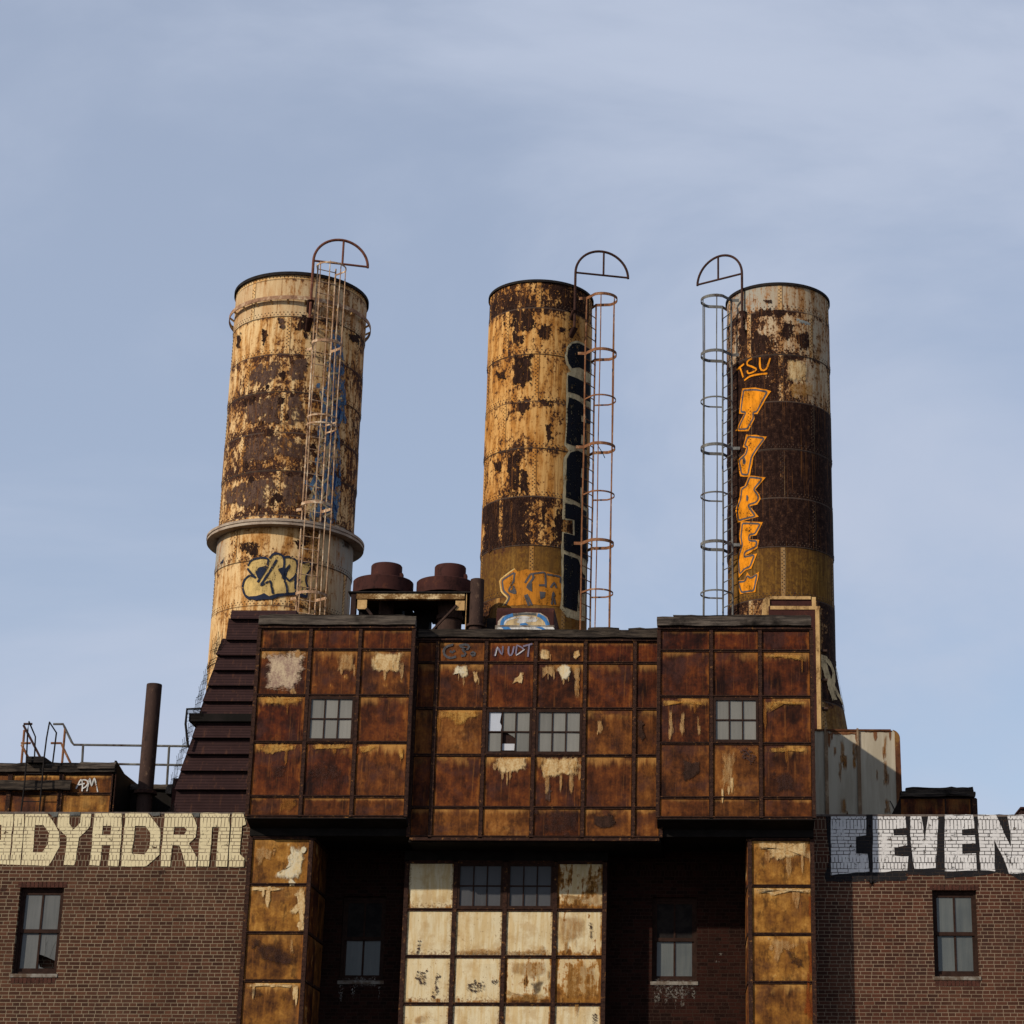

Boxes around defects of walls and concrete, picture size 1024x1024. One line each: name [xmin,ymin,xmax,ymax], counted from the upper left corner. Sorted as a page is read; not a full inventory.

rust [262,315,316,345]
rust [734,300,809,356]
rust [496,309,566,416]
rust [223,354,318,511]
rust [485,451,572,554]
rust [240,542,260,558]
peeling [262,650,305,694]
peeling [371,653,404,680]
peeling [541,650,580,694]
peeling [493,758,526,783]
peeling [541,758,581,792]
peeling [252,847,306,930]